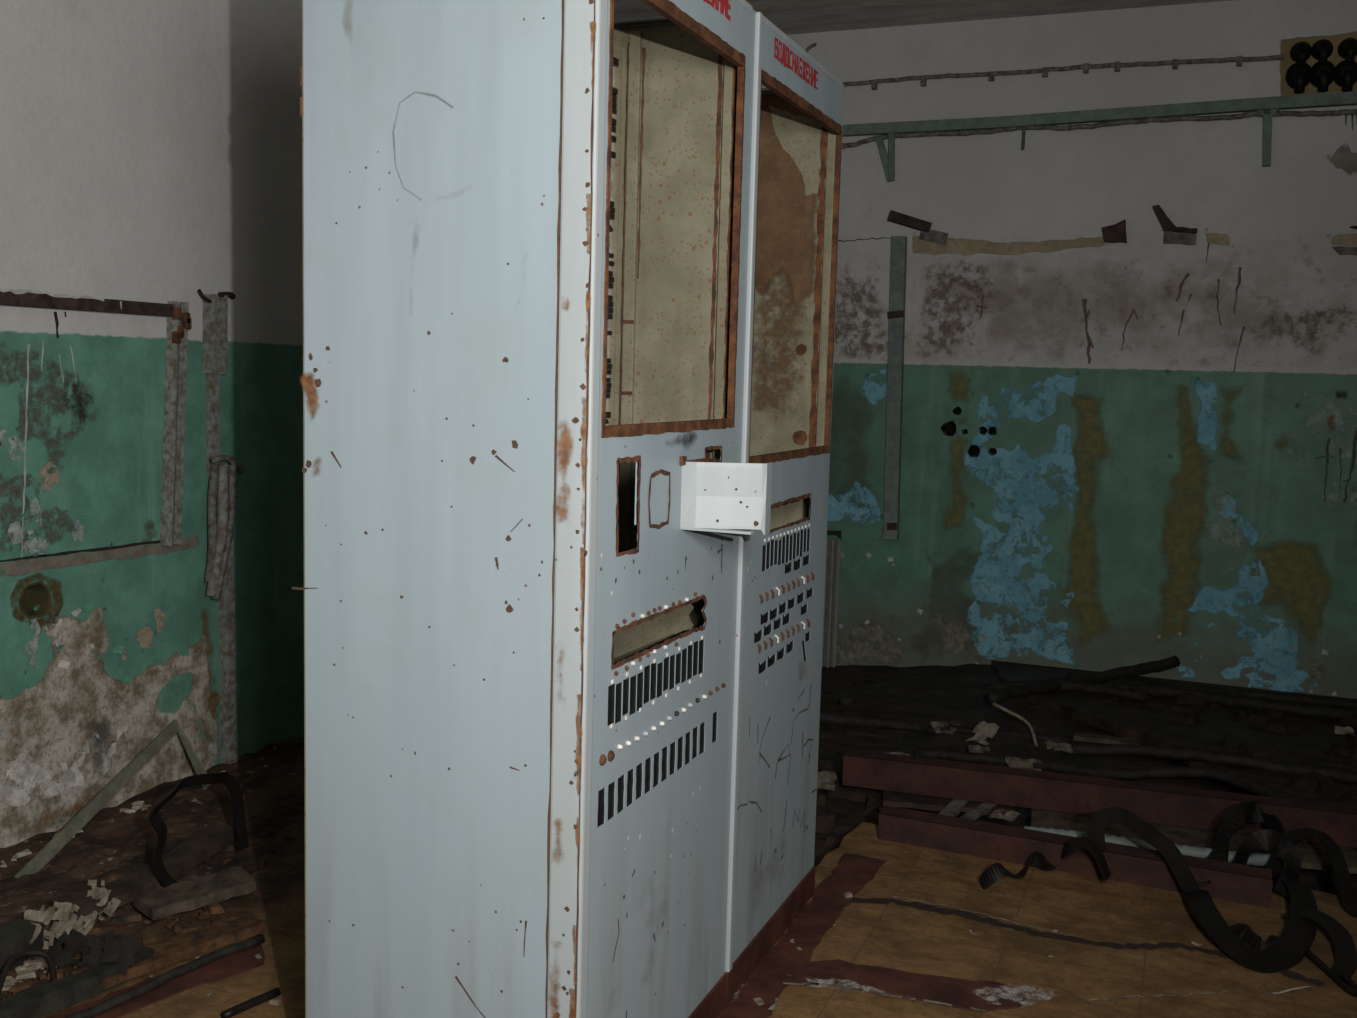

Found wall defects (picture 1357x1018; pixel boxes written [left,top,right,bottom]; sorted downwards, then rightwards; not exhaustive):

leakage [834,278,888,354]
leakage [923,267,1013,349]
peeling [827,481,884,524]
peeling [916,370,1109,667]
peeling [1157,377,1337,696]
flaking render [0,535,219,848]